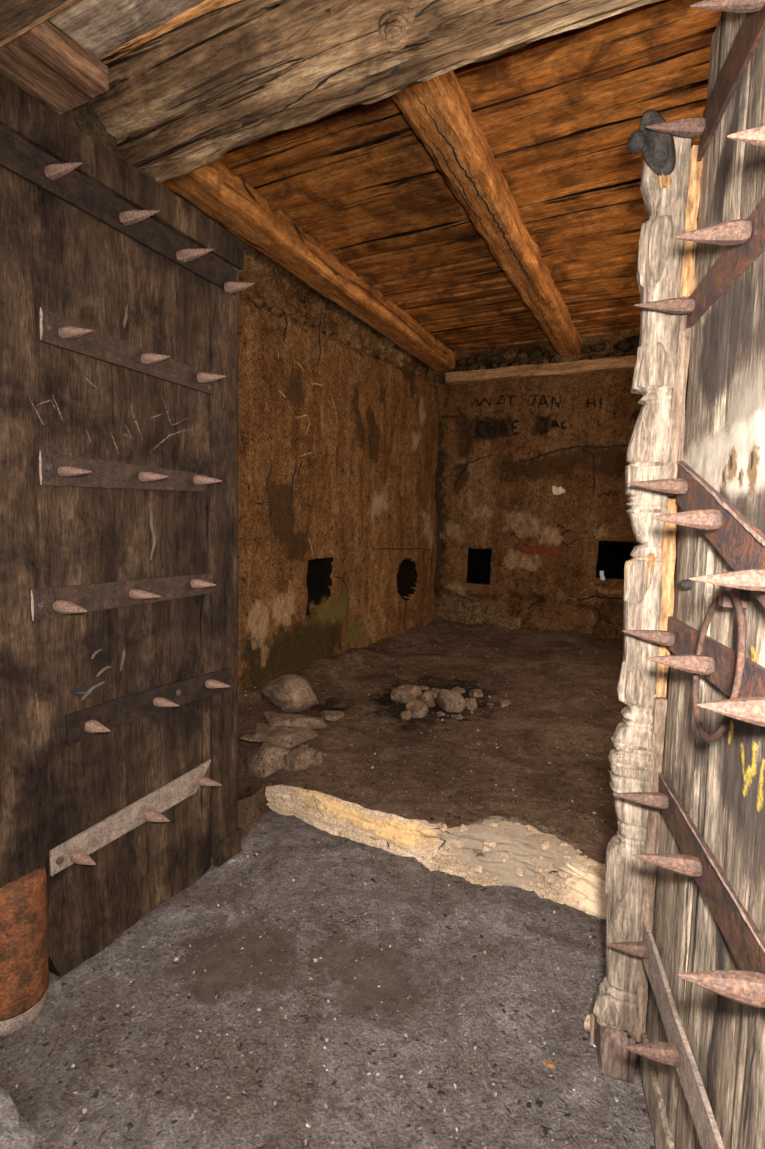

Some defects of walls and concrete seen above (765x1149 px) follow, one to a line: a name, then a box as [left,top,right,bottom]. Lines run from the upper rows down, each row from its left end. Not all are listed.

crack [456,444,628,498]
leakage [241,613,341,685]